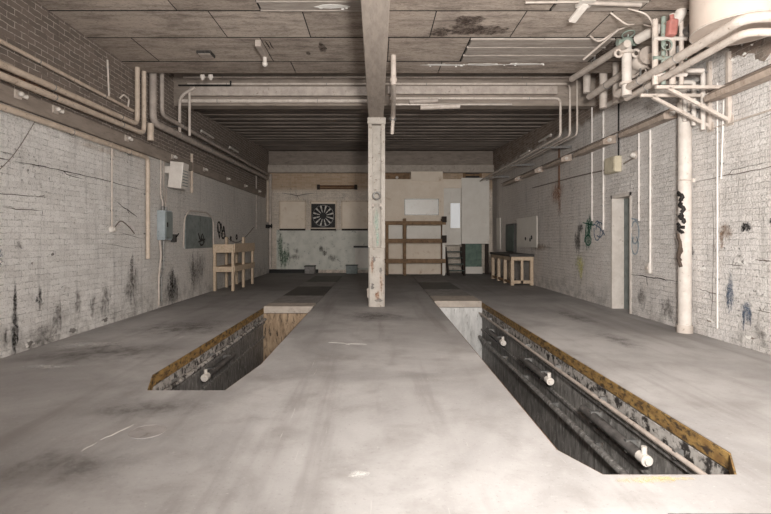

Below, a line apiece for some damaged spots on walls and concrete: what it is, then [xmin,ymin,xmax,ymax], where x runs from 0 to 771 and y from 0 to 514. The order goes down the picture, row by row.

water stain [431,16,509,37]
peeling [725,36,771,62]
crack [0,151,140,217]
water stain [4,289,18,353]